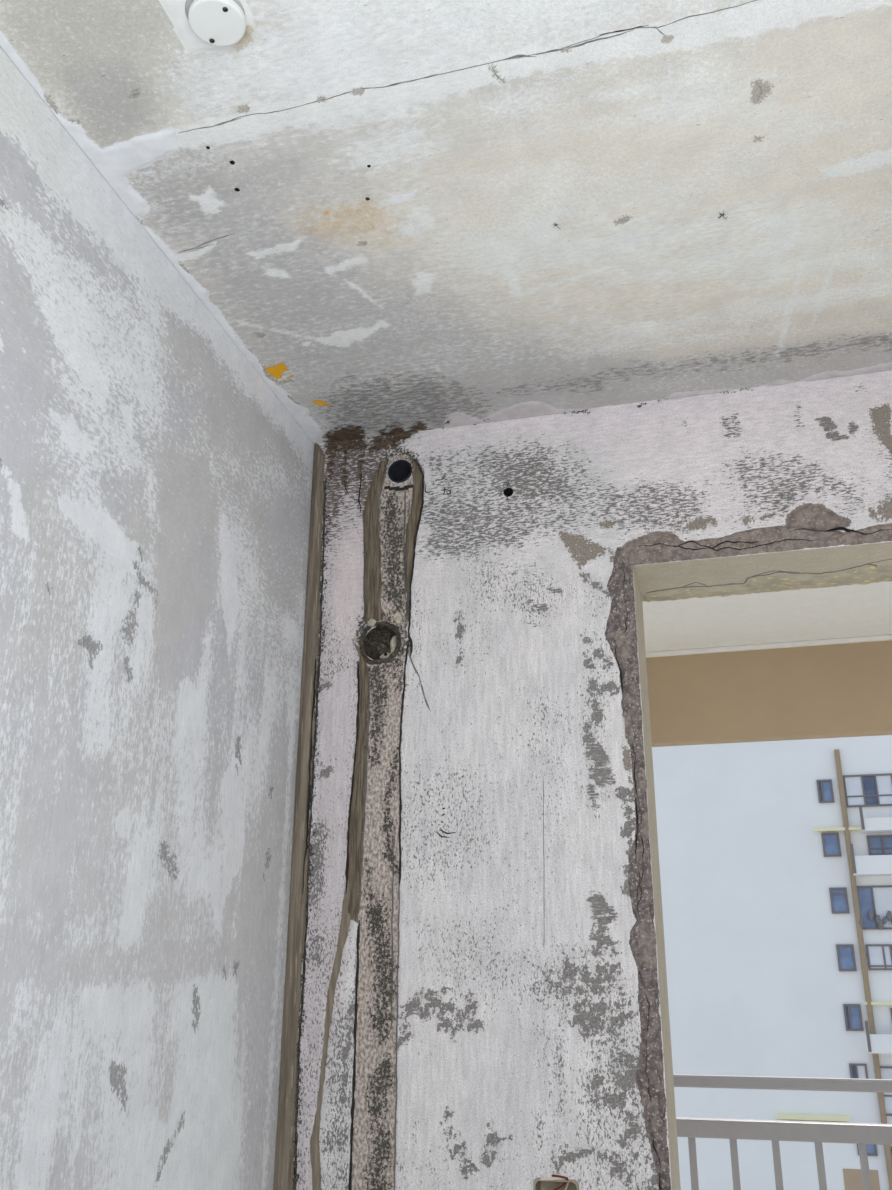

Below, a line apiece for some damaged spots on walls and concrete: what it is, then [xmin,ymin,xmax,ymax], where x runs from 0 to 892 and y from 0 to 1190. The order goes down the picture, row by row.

crack [180,0,757,133]
leakage [323,422,431,494]